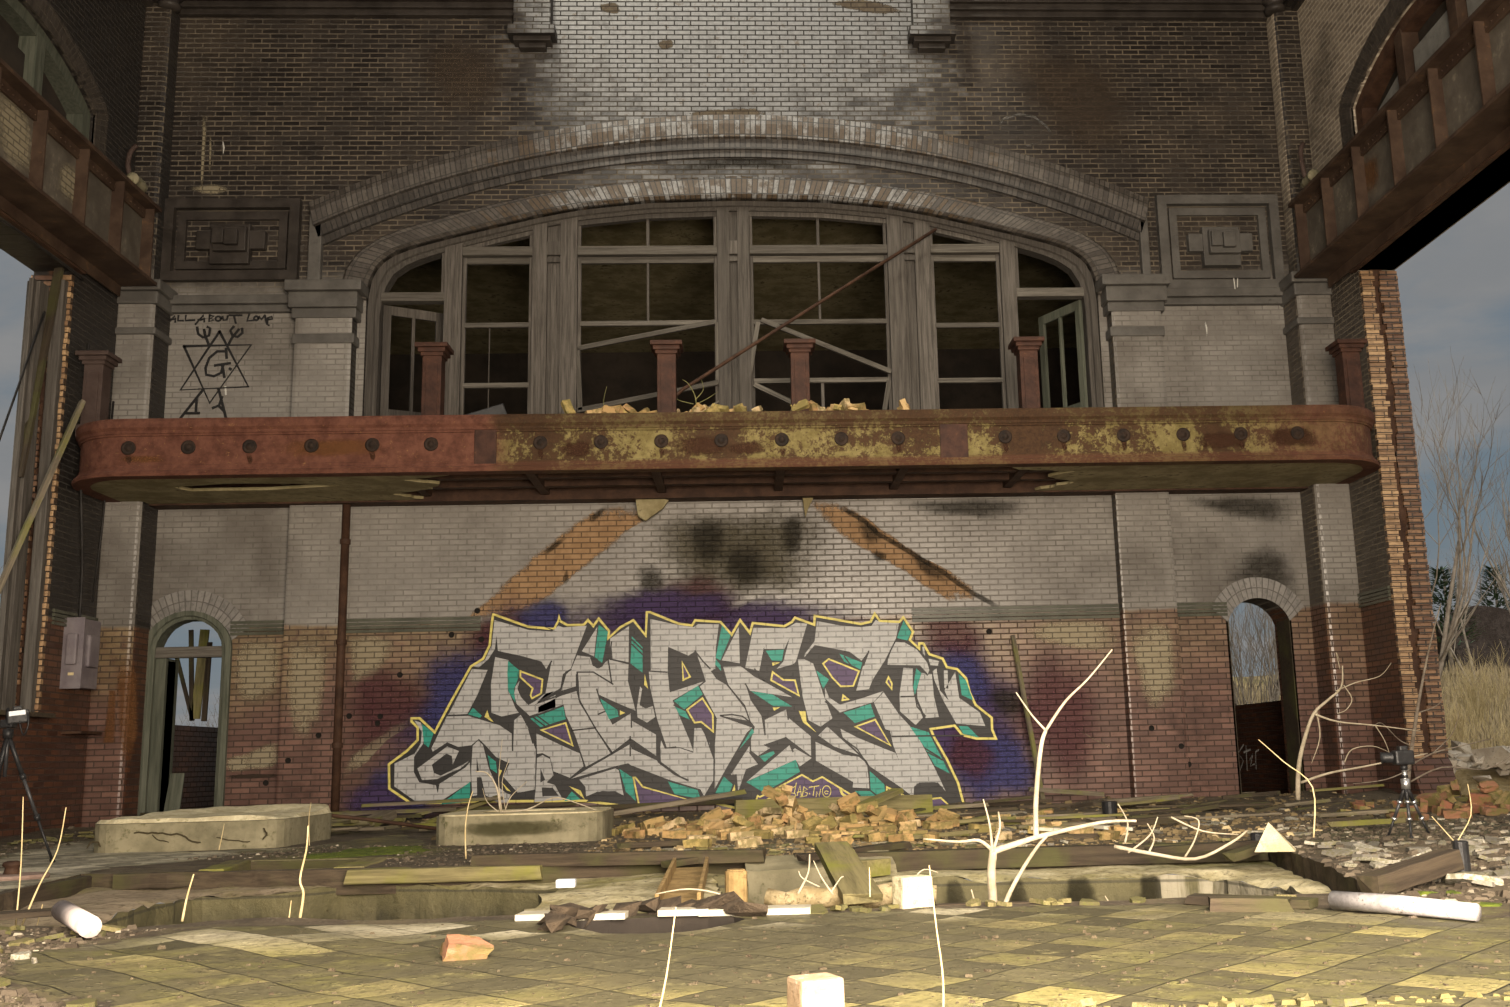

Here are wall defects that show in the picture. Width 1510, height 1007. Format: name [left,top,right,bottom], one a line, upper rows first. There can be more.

peeling [600,3,620,14]
peeling [833,0,901,14]
peeling [659,40,673,49]
corrosion [564,442,589,456]
corrosion [659,437,785,456]
peeling [862,525,884,559]
water stain [670,519,806,591]
water stain [643,572,662,591]